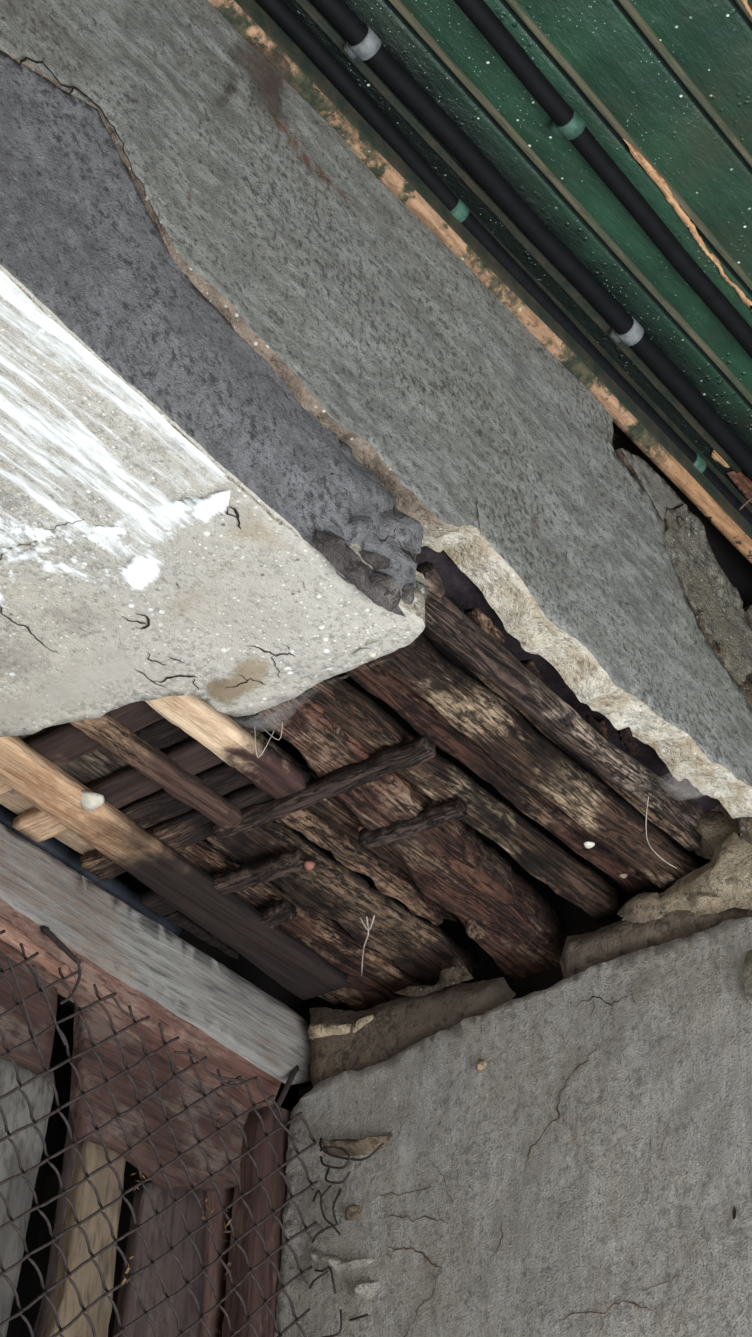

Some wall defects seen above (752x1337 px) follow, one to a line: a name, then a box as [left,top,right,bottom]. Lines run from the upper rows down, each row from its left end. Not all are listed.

peeling [622,137,752,311]
peeling [0,270,230,590]
crack [0,519,84,560]
flaking render [316,530,428,617]
crack [0,605,58,653]
crack [124,614,295,690]
flaking render [209,661,266,703]
flaking render [560,832,752,979]
crack [522,993,636,1176]
crack [376,1169,453,1337]
crack [559,1275,678,1320]